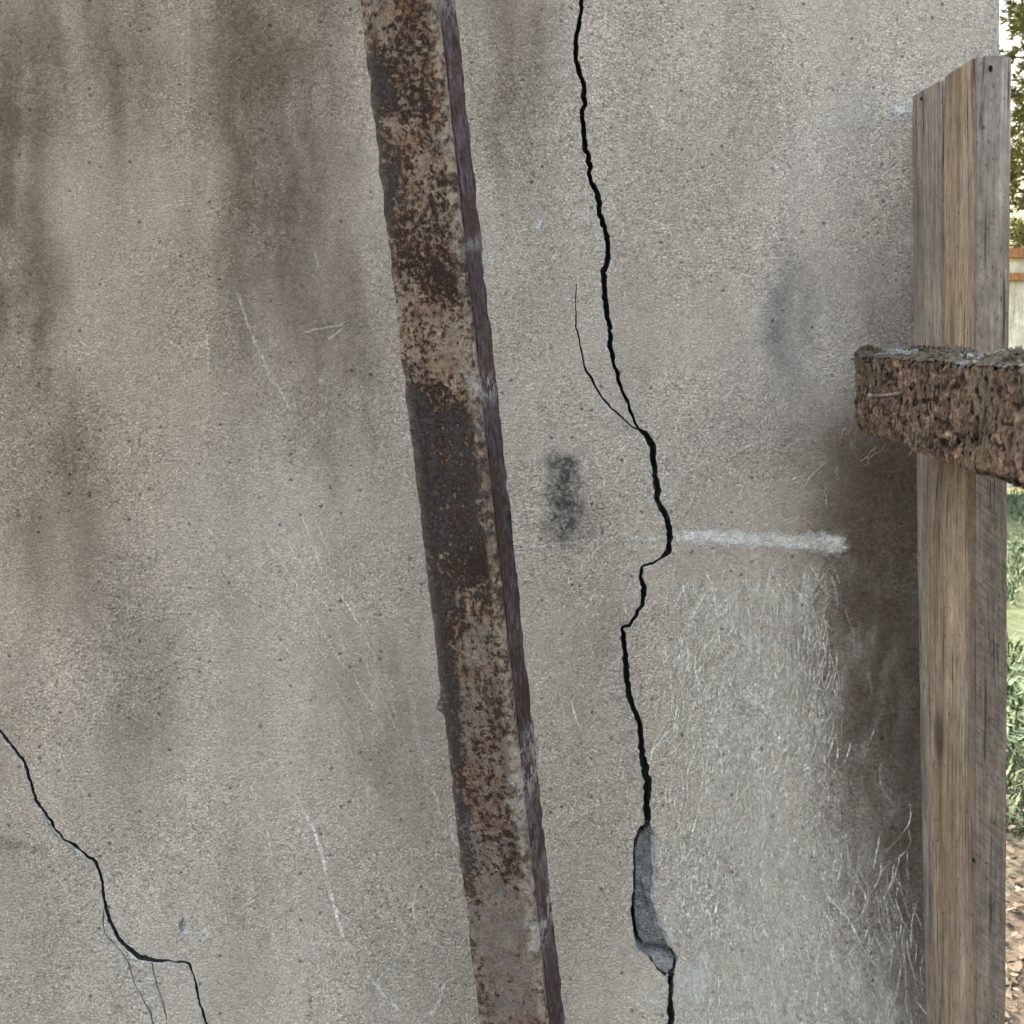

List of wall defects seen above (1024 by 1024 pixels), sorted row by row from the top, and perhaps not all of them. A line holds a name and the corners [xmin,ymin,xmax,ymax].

mould [548,456,582,539]
crack [571,0,674,825]
crack [0,729,208,1024]
spalling [630,815,679,977]
crack [665,968,676,1024]
damp [650,436,926,1024]